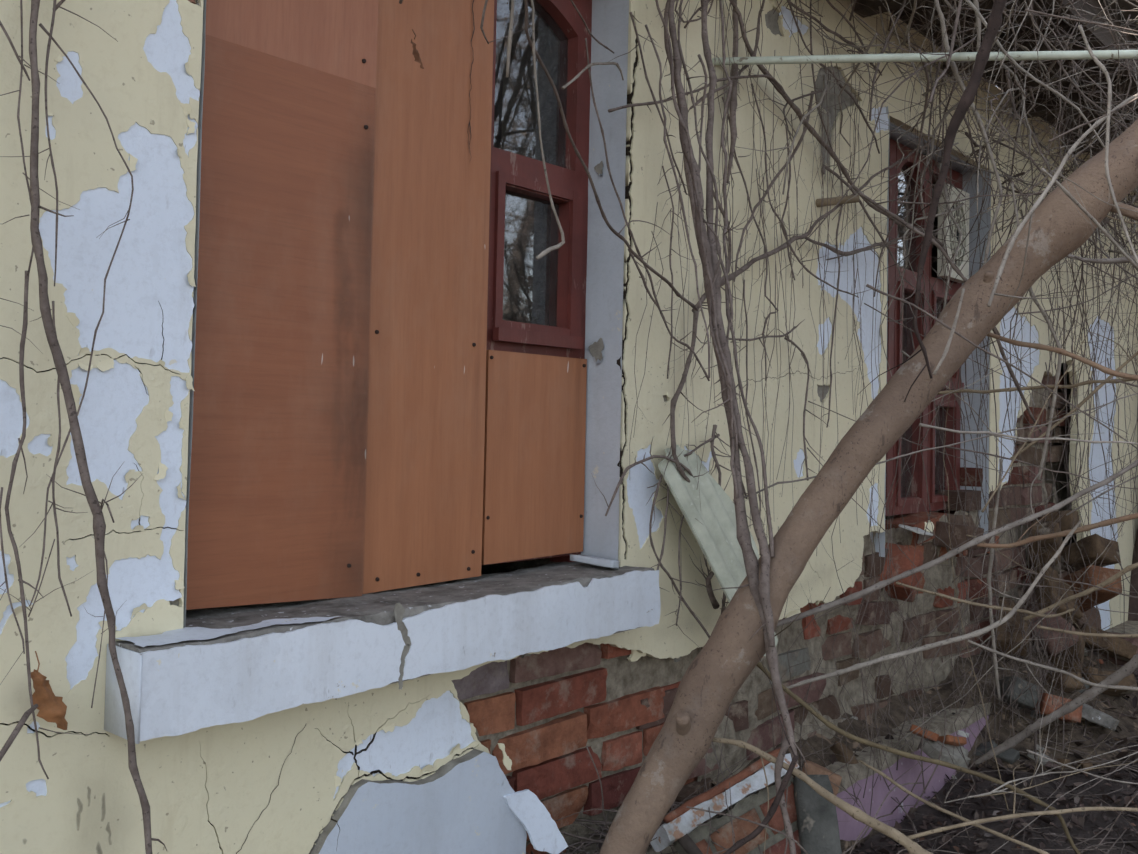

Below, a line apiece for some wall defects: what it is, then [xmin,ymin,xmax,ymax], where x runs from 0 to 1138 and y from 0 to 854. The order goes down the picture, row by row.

peeling [0,379,53,458]
peeling [39,0,200,690]
peeling [816,227,882,399]
peeling [1088,316,1118,541]
peeling [0,551,33,635]
spalling [667,307,1076,813]
peeling [1094,600,1112,631]
crack [0,721,108,737]
crack [208,603,434,854]
spalling [333,643,703,854]